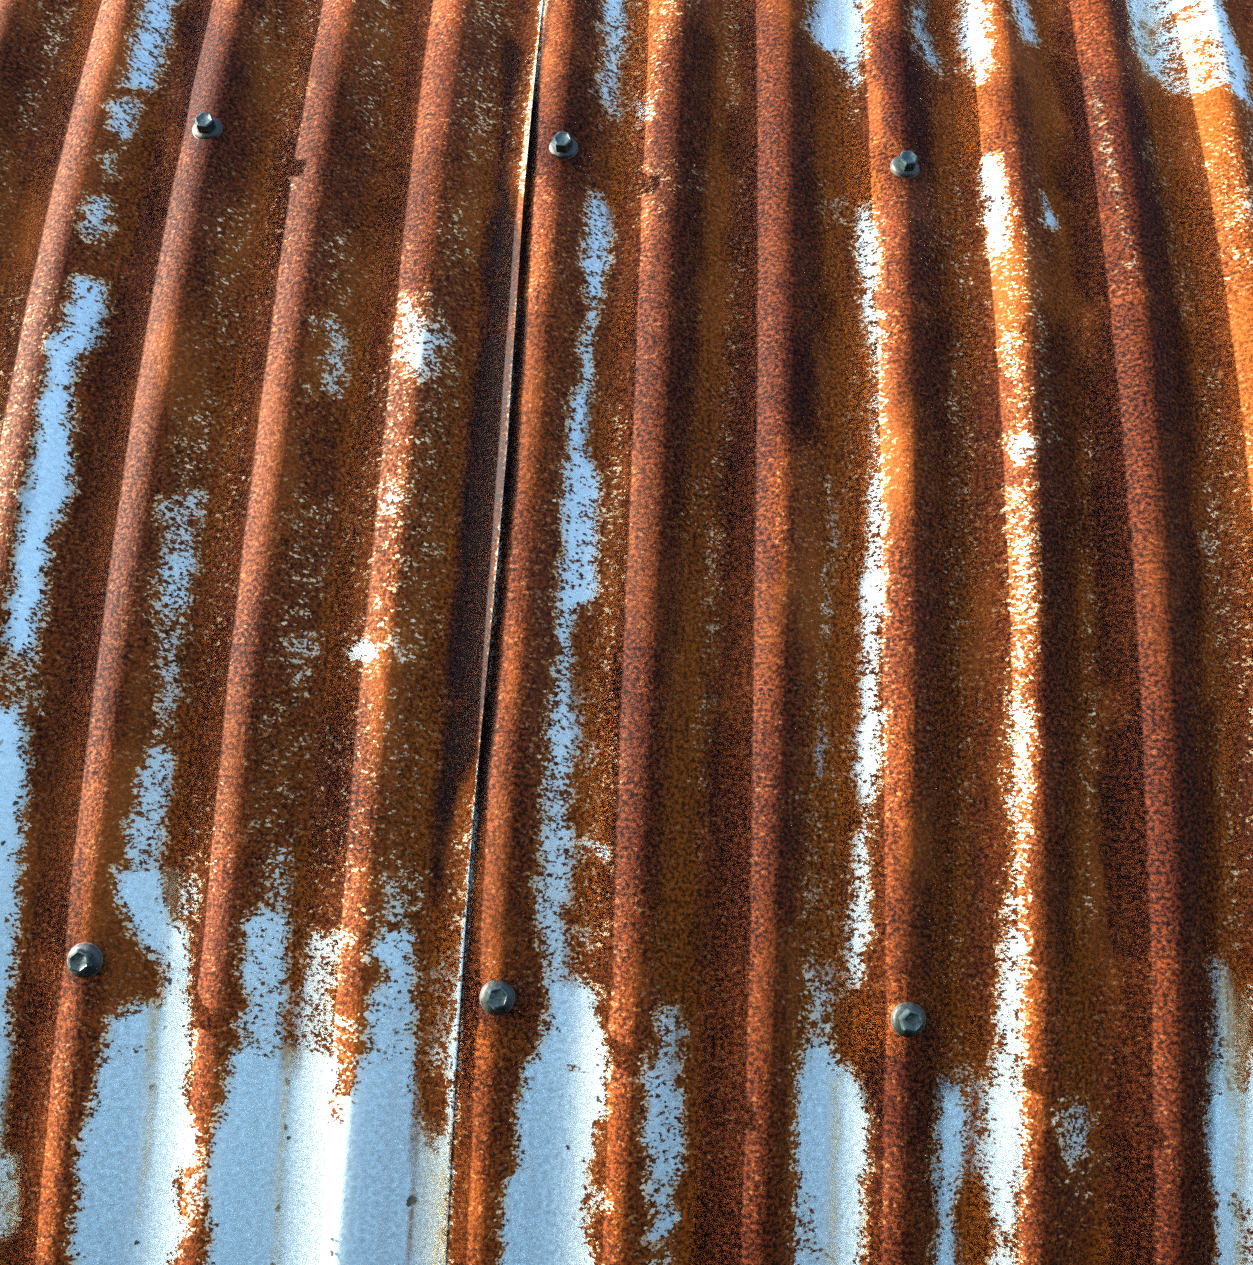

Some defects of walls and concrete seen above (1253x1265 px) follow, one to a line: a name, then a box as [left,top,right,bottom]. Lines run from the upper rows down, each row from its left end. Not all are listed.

rust [1137,20,1153,41]
rust [955,108,978,128]
rust [1147,0,1253,1095]
rust [1225,1189,1253,1265]